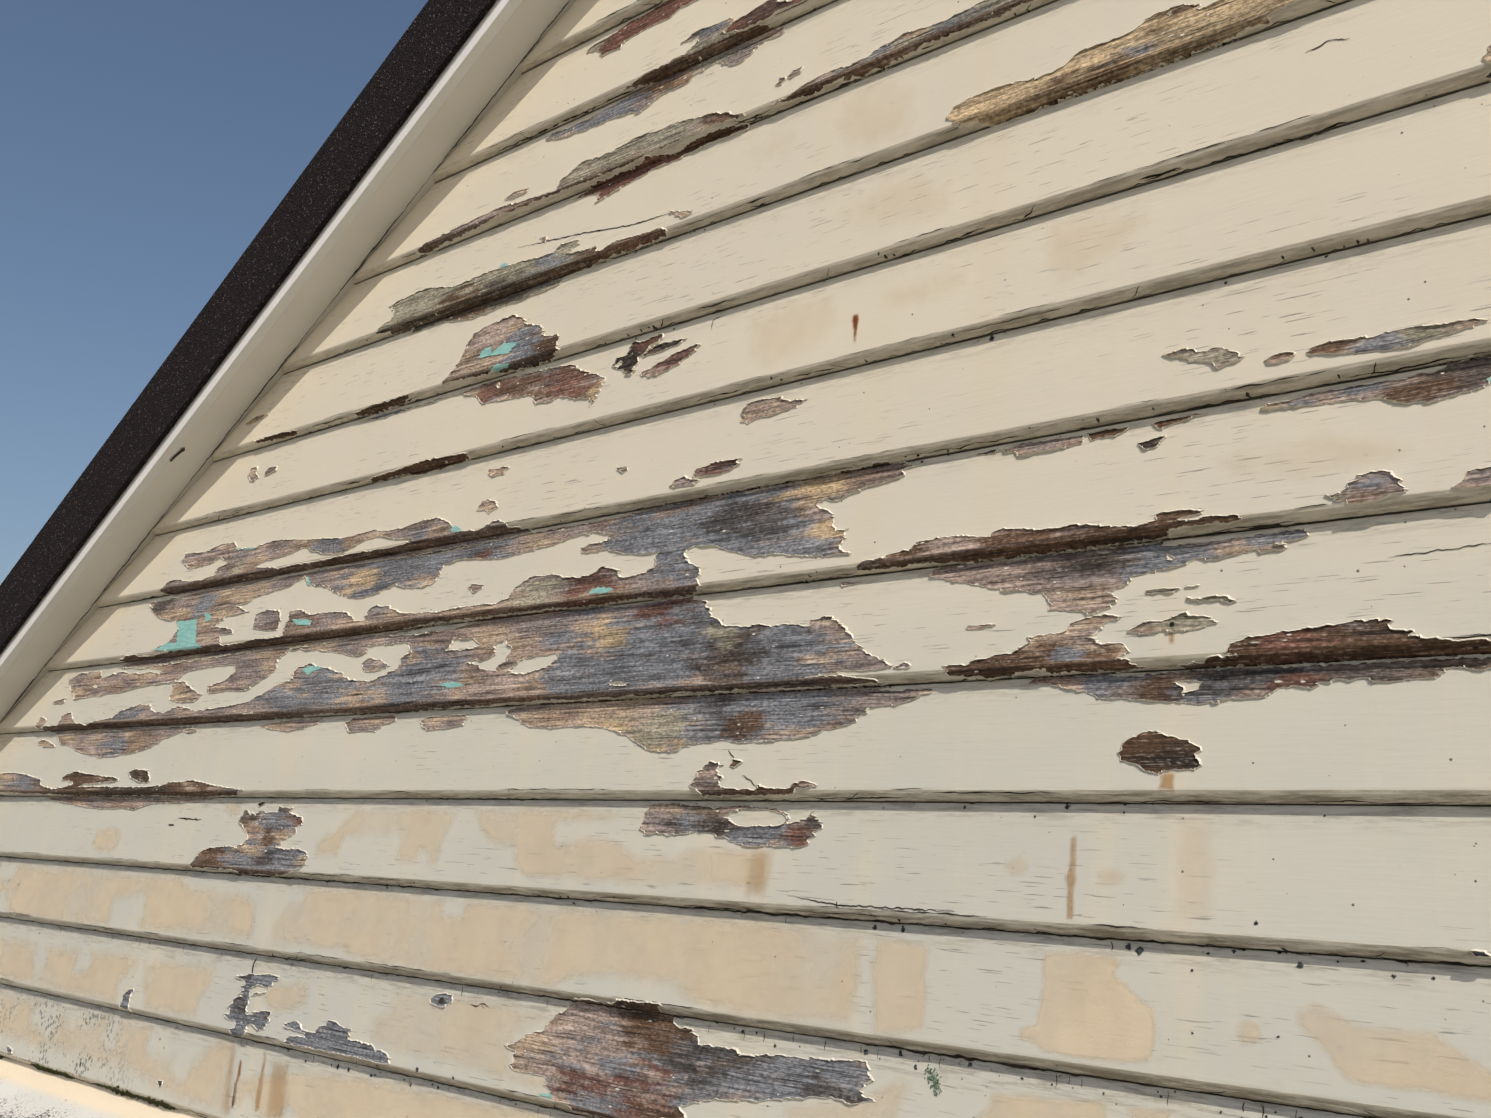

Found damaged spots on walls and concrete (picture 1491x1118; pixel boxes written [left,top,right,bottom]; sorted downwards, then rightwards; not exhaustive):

peeling [771,0,1038,107]
peeling [945,0,1302,129]
peeling [354,210,701,422]
peeling [1162,347,1245,370]
peeling [1261,354,1491,412]
peeling [1264,317,1489,365]
peeling [0,458,1491,878]
peeling [223,973,391,1065]
peeling [504,997,876,1118]